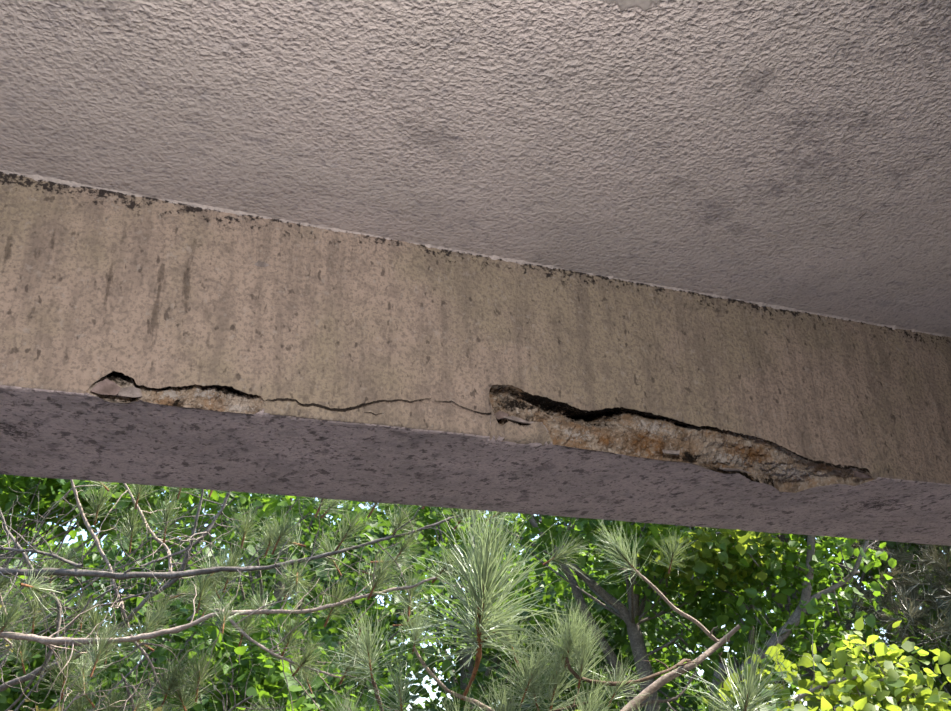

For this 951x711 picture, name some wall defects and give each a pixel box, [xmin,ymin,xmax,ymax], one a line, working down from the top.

spalling [85,371,265,415]
crack [266,398,492,428]
spalling [489,384,874,493]